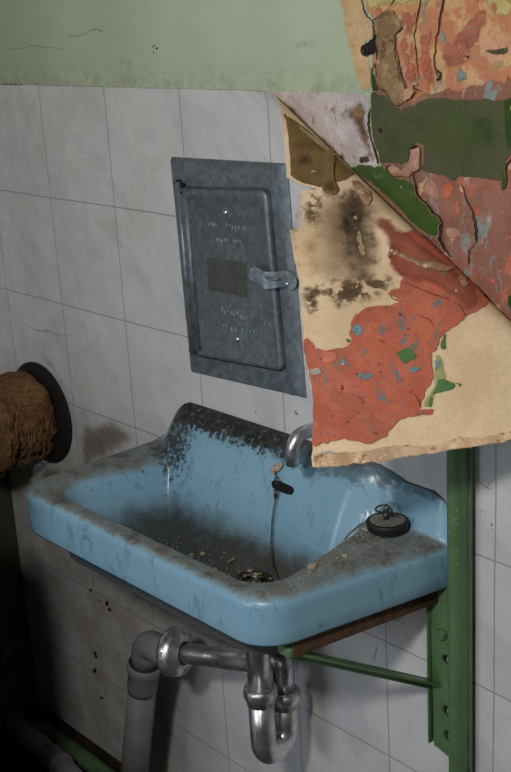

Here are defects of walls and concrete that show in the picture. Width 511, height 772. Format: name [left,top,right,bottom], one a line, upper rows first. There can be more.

crack [361,0,444,108]
crack [367,108,379,165]
peeling [269,0,511,321]
water stain [305,276,389,313]
water stain [390,249,468,286]